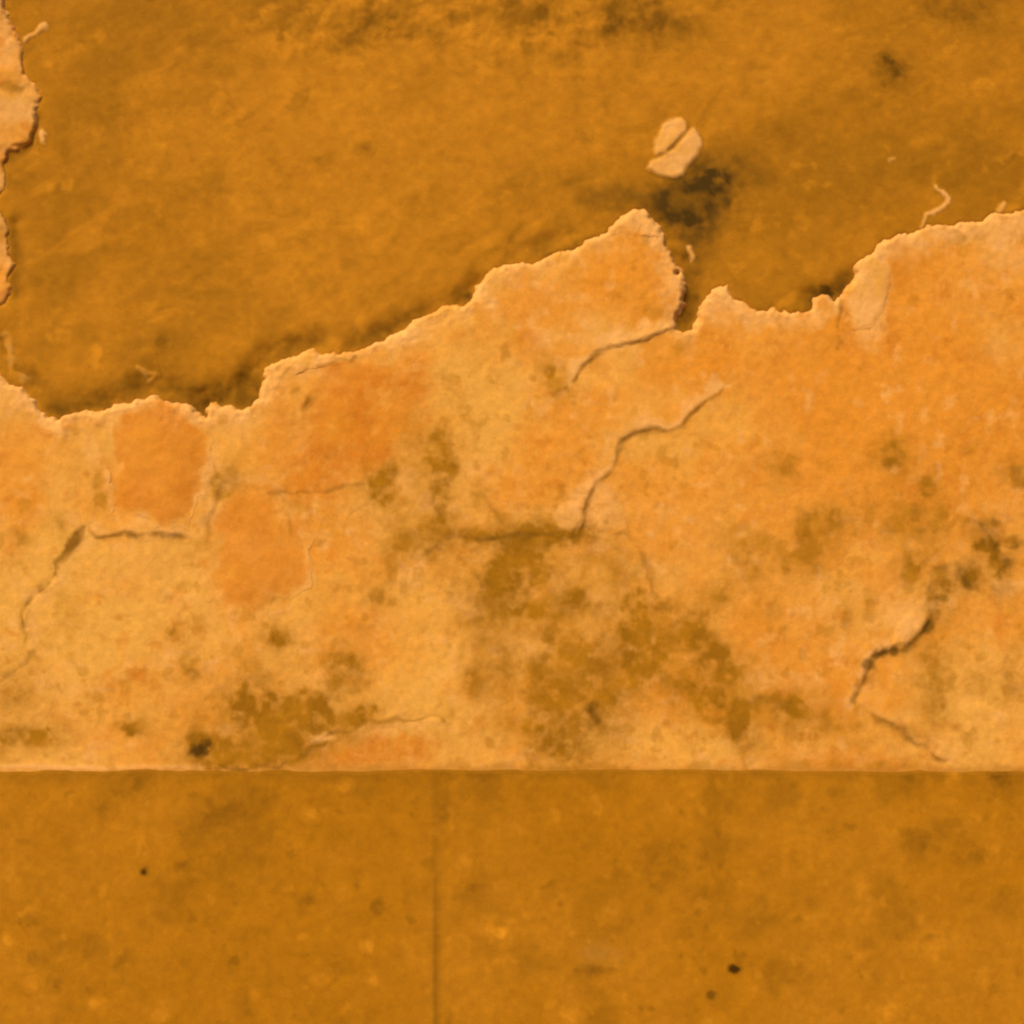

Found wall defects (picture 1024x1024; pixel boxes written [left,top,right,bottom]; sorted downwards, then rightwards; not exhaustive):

peeling [0,0,52,194]
peeling [645,116,704,180]
peeling [180,182,1024,587]
crack [571,325,677,386]
crack [0,458,225,686]
peeling [0,328,256,772]
crack [423,387,726,603]
leakage [350,382,1024,771]
peeling [613,711,781,771]
peeling [731,538,937,719]
crack [849,613,951,766]
peeling [933,695,1024,772]